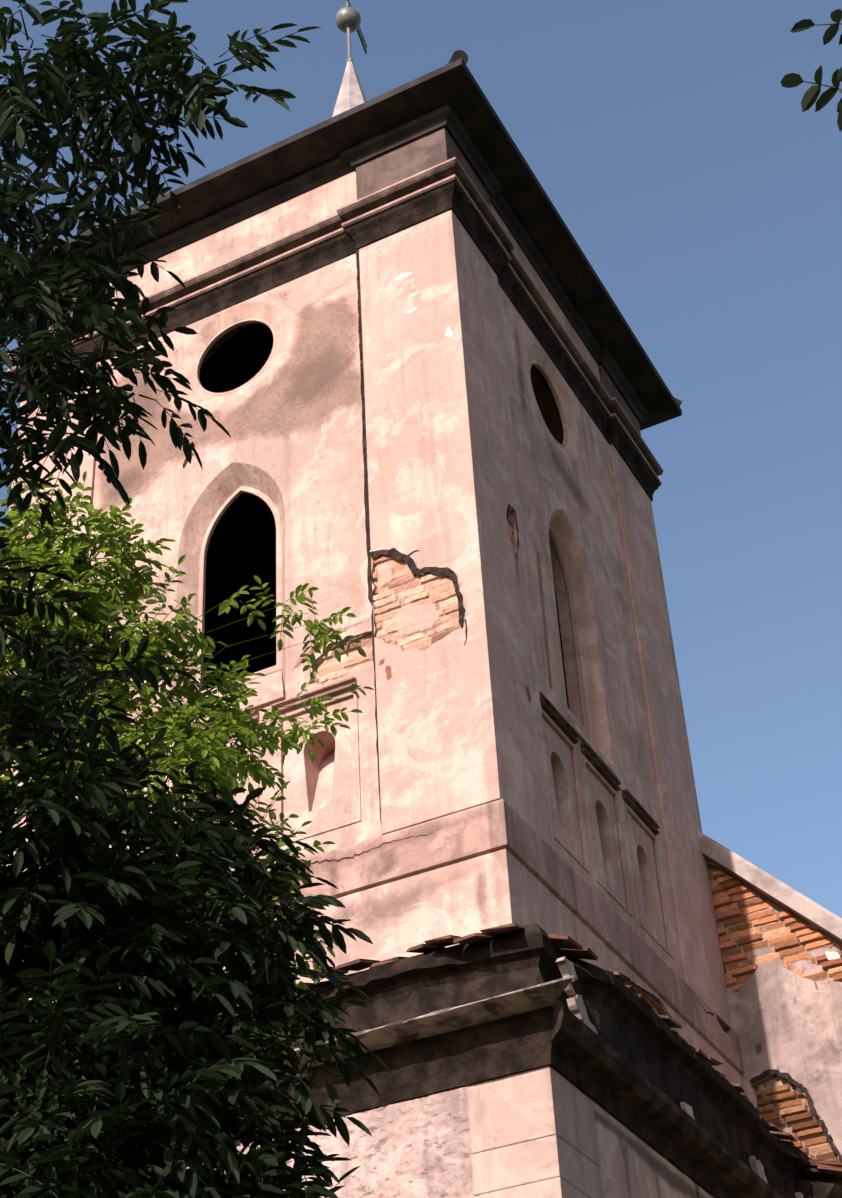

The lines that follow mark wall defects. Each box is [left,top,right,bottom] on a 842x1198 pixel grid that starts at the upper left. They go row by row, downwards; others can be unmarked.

flaking render [296,546,469,685]
flaking render [708,867,842,992]
flaking render [608,967,676,1031]
flaking render [749,1069,842,1162]